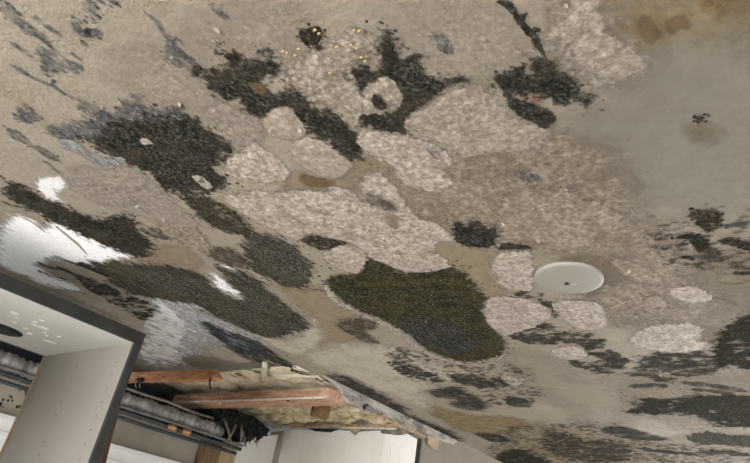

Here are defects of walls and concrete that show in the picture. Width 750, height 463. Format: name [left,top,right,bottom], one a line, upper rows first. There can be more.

water stain [158,21,597,191]
peeling [211,273,243,300]
water stain [0,95,750,463]
flaking render [378,133,726,326]